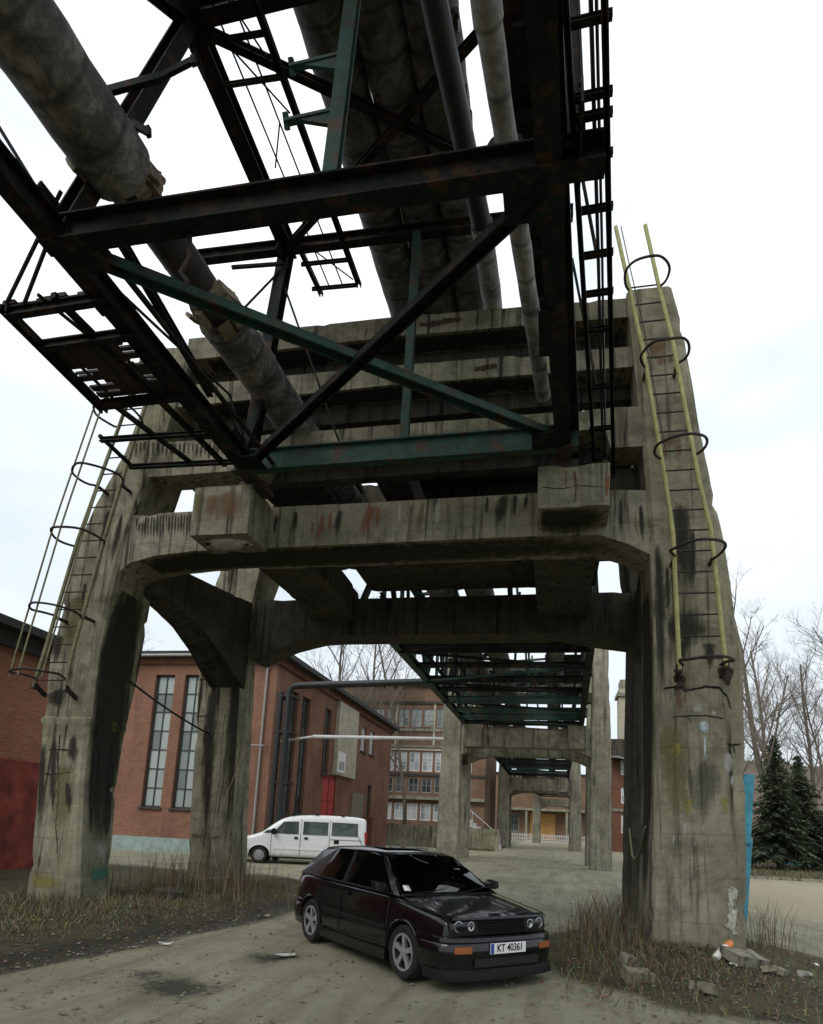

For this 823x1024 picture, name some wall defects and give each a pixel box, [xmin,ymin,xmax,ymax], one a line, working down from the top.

water stain [136,514,191,537]
water stain [89,591,142,856]
water stain [202,633,241,817]
water stain [642,507,715,886]
crack [664,685,741,755]